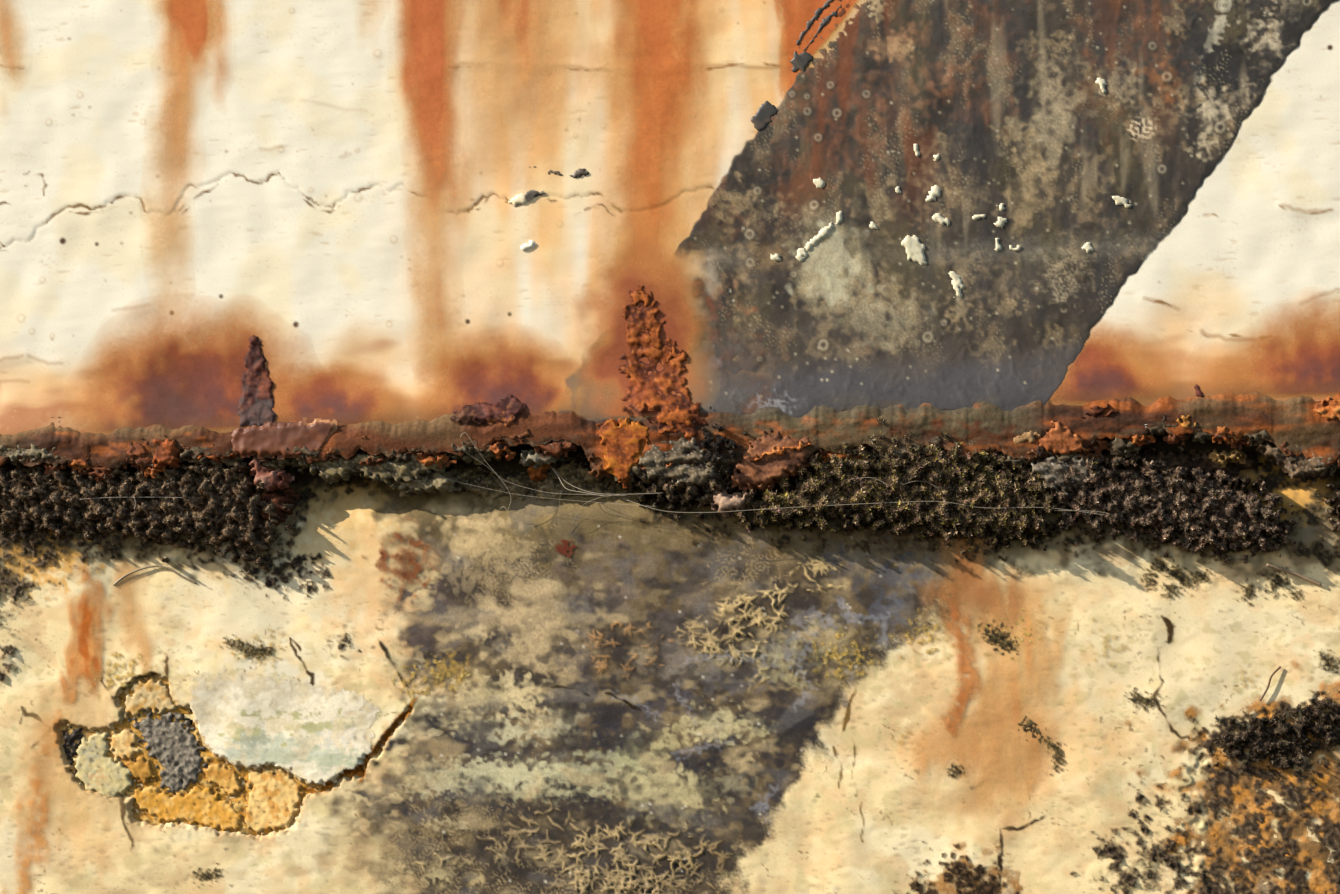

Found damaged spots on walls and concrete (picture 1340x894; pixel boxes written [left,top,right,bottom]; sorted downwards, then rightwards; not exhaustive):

crack [41,173,274,220]
rust [0,0,1340,482]
rust [16,570,103,894]
rust [118,572,149,659]
spalling [58,669,387,836]
rust [917,535,1050,805]